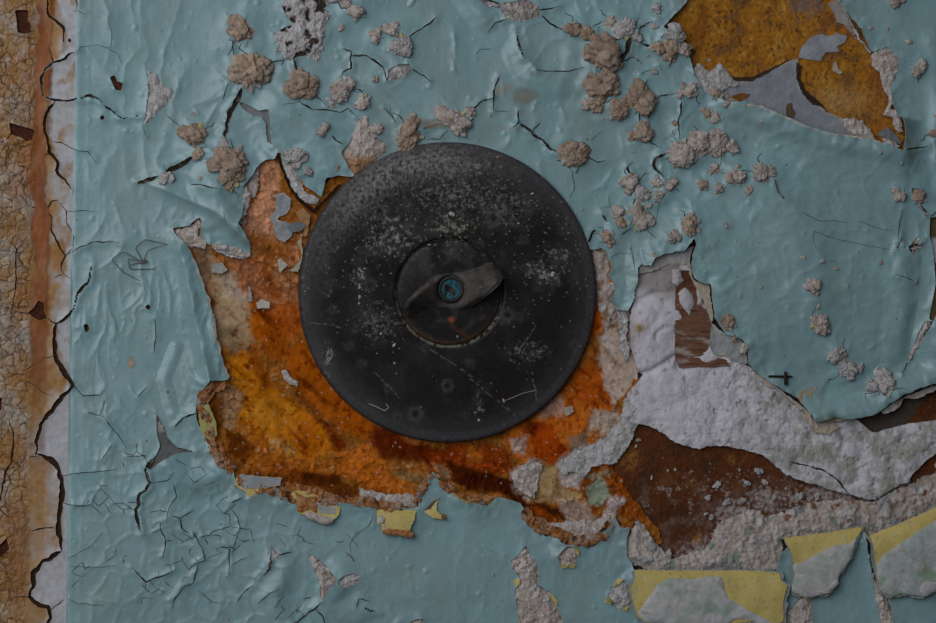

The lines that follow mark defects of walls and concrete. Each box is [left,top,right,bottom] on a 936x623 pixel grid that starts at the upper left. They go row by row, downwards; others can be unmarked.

spalling [273,0,347,63]
crack [299,96,352,113]
crack [341,48,387,81]
peeling [664,0,906,150]
corrosion [28,0,54,375]
crack [0,0,325,623]
spalling [173,116,936,569]
corrosion [905,390,936,424]
crack [337,514,374,562]
spalling [511,546,563,623]
peeling [605,506,936,623]
corrosion [612,424,936,571]